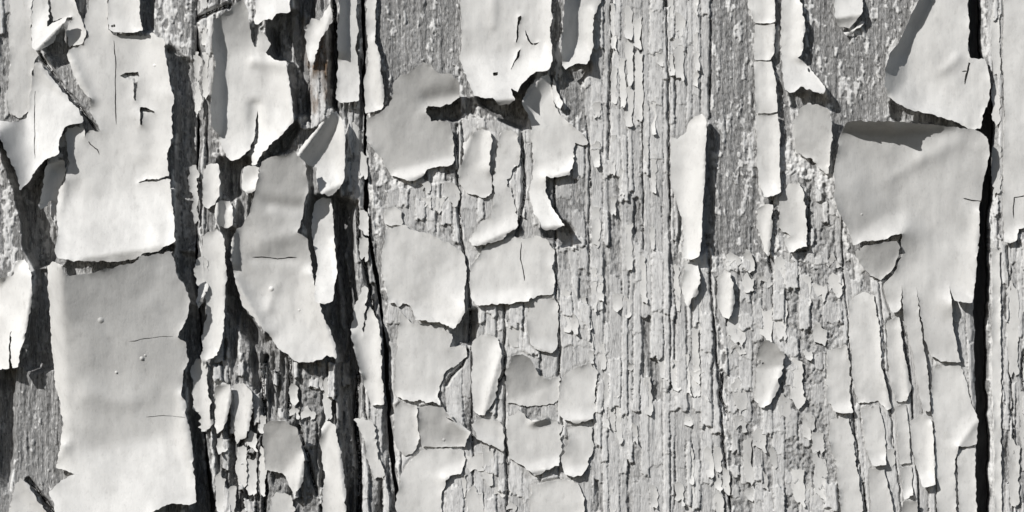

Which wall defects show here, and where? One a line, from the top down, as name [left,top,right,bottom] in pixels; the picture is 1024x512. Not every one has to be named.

peeling [0,0,700,512]
peeling [644,0,1024,512]